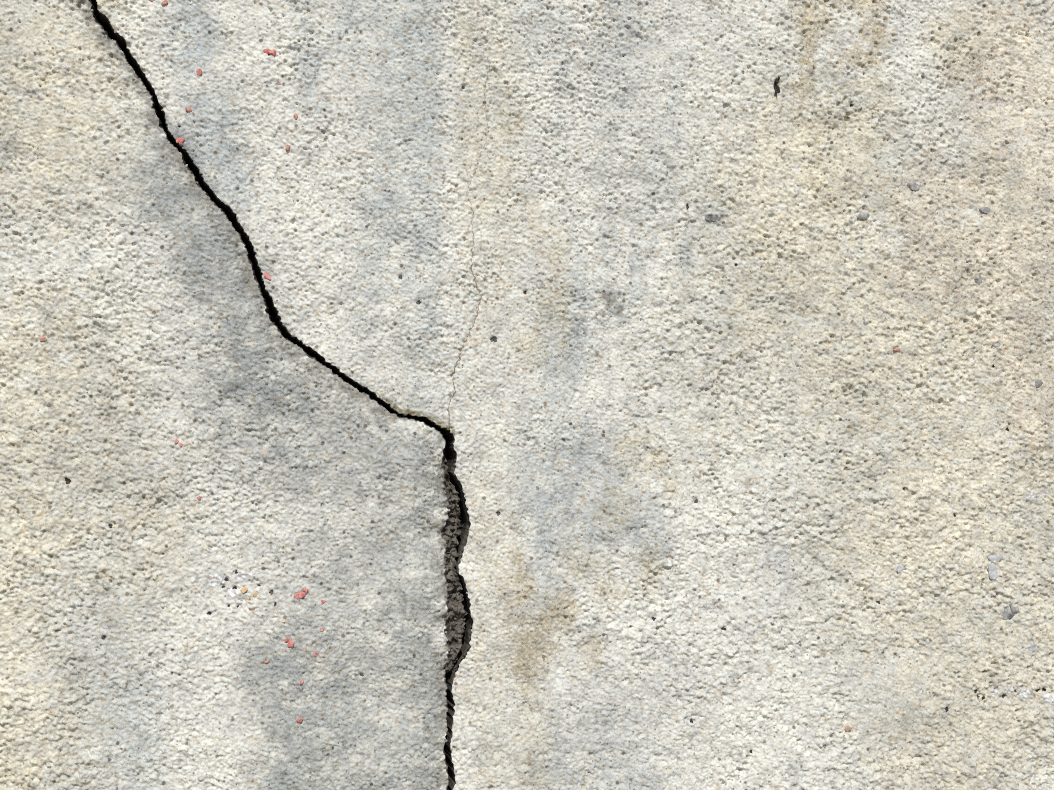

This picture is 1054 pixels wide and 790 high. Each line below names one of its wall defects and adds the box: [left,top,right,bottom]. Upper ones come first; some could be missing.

crack [80,0,490,790]